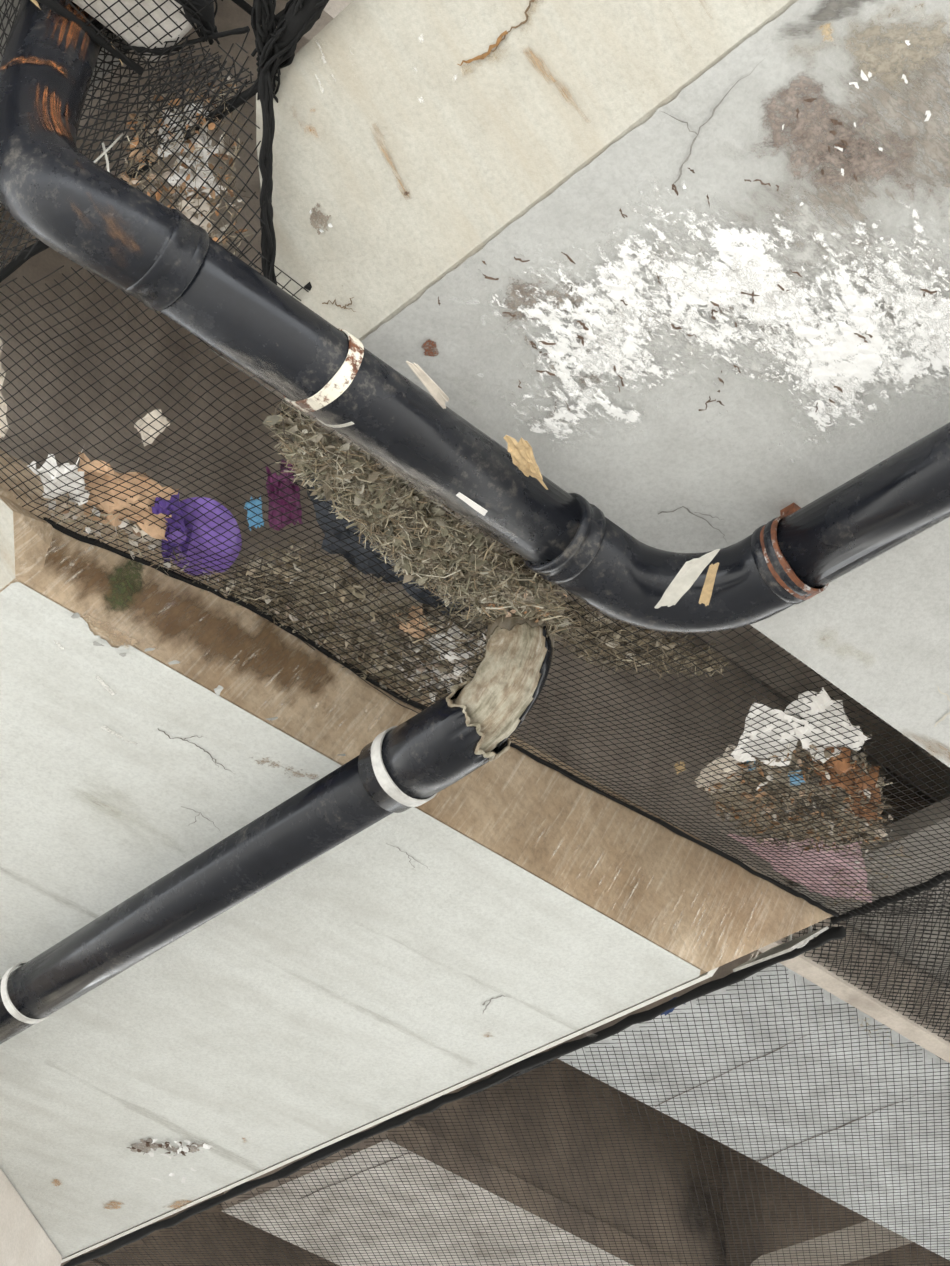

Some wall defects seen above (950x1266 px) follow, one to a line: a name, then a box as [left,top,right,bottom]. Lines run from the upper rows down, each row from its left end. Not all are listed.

crack [458,0,535,66]
damp [786,0,870,36]
rust [525,50,570,100]
crack [661,59,764,183]
damp [768,8,950,274]
peeling [126,1138,213,1183]